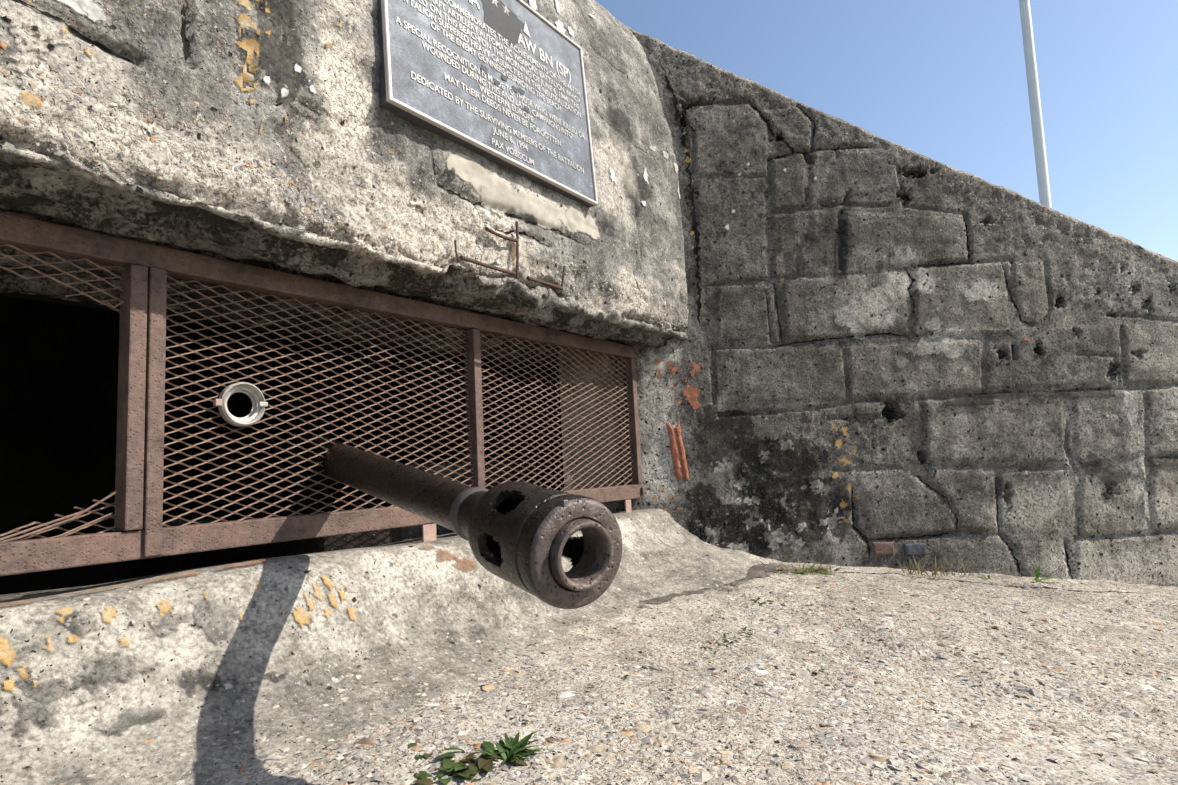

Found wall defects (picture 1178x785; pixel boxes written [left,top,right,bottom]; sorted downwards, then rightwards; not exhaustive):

crack [15,0,134,63]
crack [181,0,190,61]
leakage [257,0,305,116]
crack [659,55,702,332]
leakage [64,610,101,638]
leakage [136,596,239,653]
leakage [0,649,166,734]
leakage [181,666,222,694]
leakage [264,671,288,680]